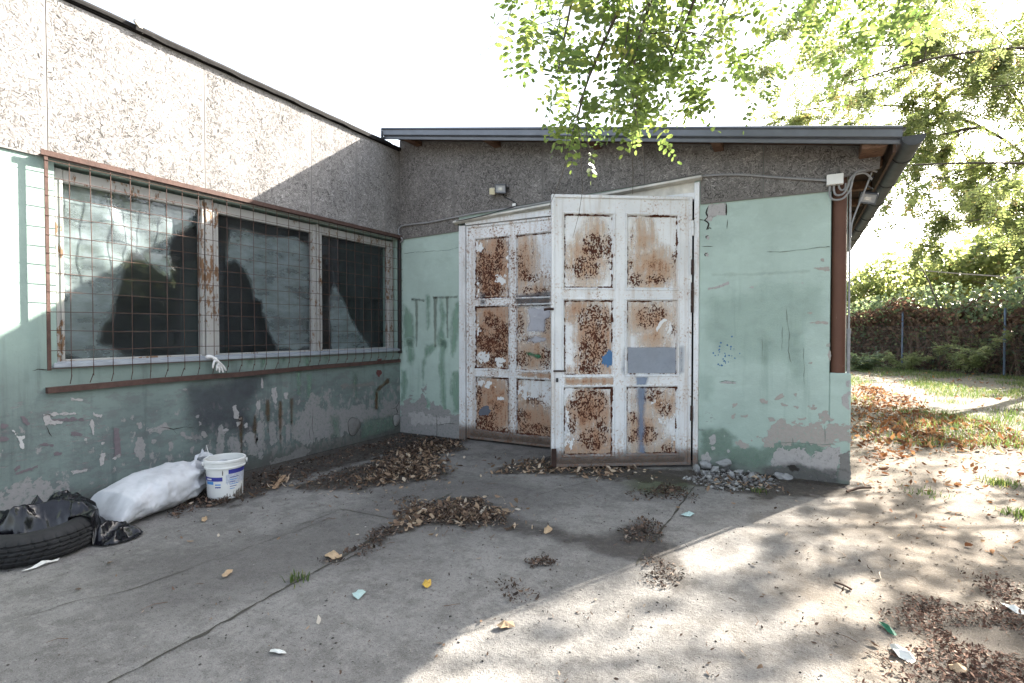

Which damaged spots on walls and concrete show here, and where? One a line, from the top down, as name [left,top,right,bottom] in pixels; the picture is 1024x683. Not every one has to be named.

leakage [403,297,459,411]
corrosion [471,233,551,445]
corrosion [558,213,684,464]
peeling [0,416,30,449]
peeling [43,397,120,466]
flaking render [134,378,379,465]
flaking render [701,393,853,481]
flaking render [0,465,87,511]